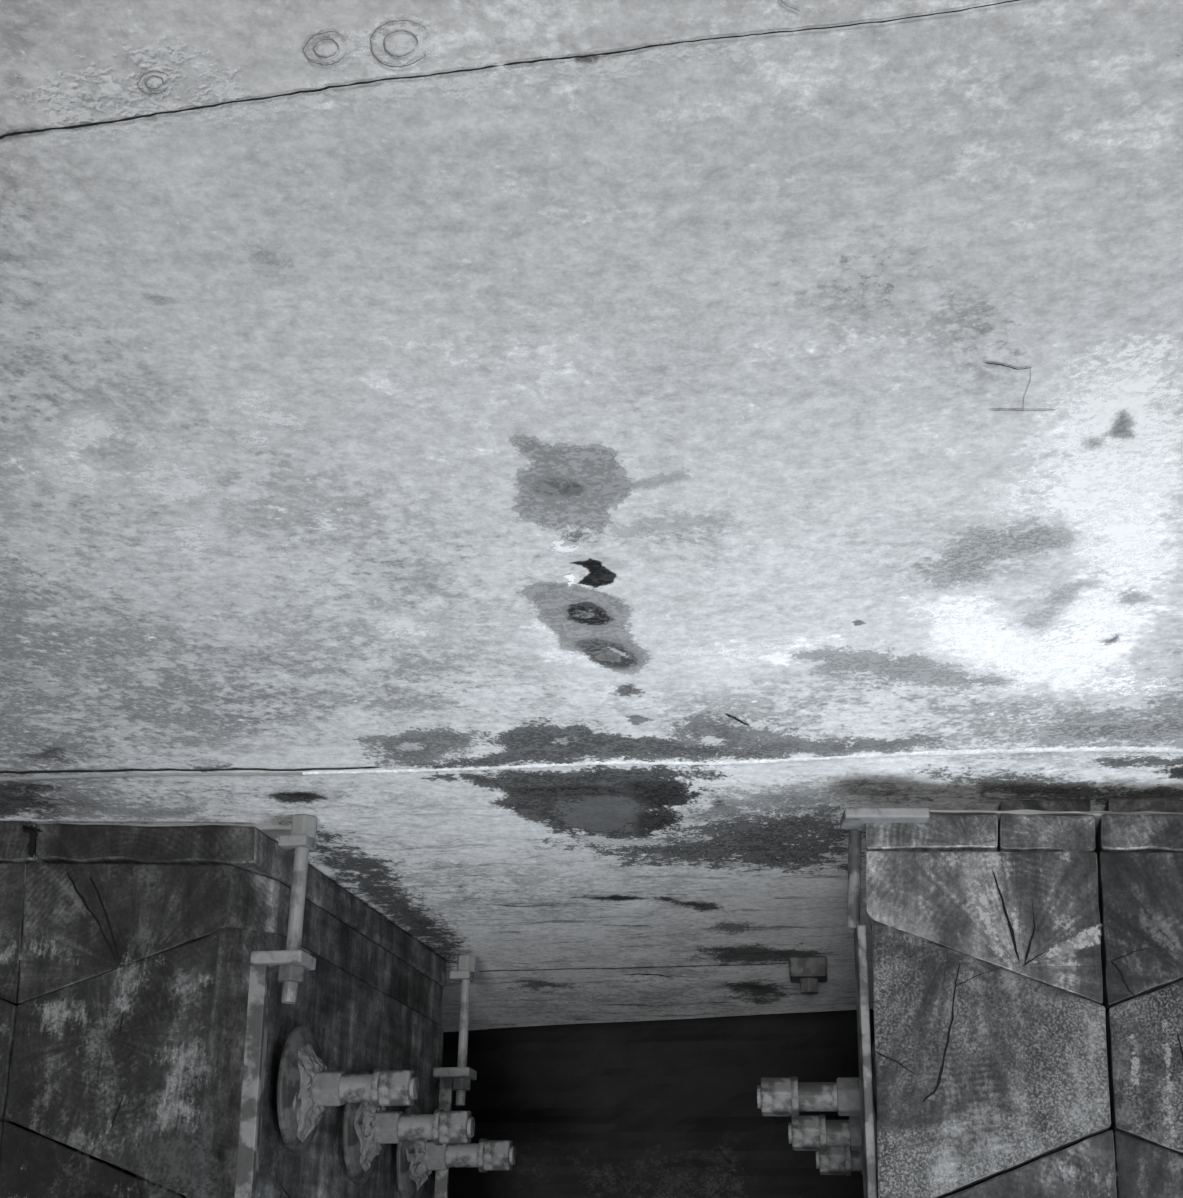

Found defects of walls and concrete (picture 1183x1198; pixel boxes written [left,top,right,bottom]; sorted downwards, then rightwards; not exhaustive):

crack [0,0,1020,145]
damp [509,435,639,548]
damp [668,327,1183,769]
damp [517,582,650,675]
spalling [547,539,637,669]
spalling [595,684,645,697]
spalling [626,715,655,725]
damp [352,711,946,769]
damp [536,779,875,878]
damp [914,766,1183,805]